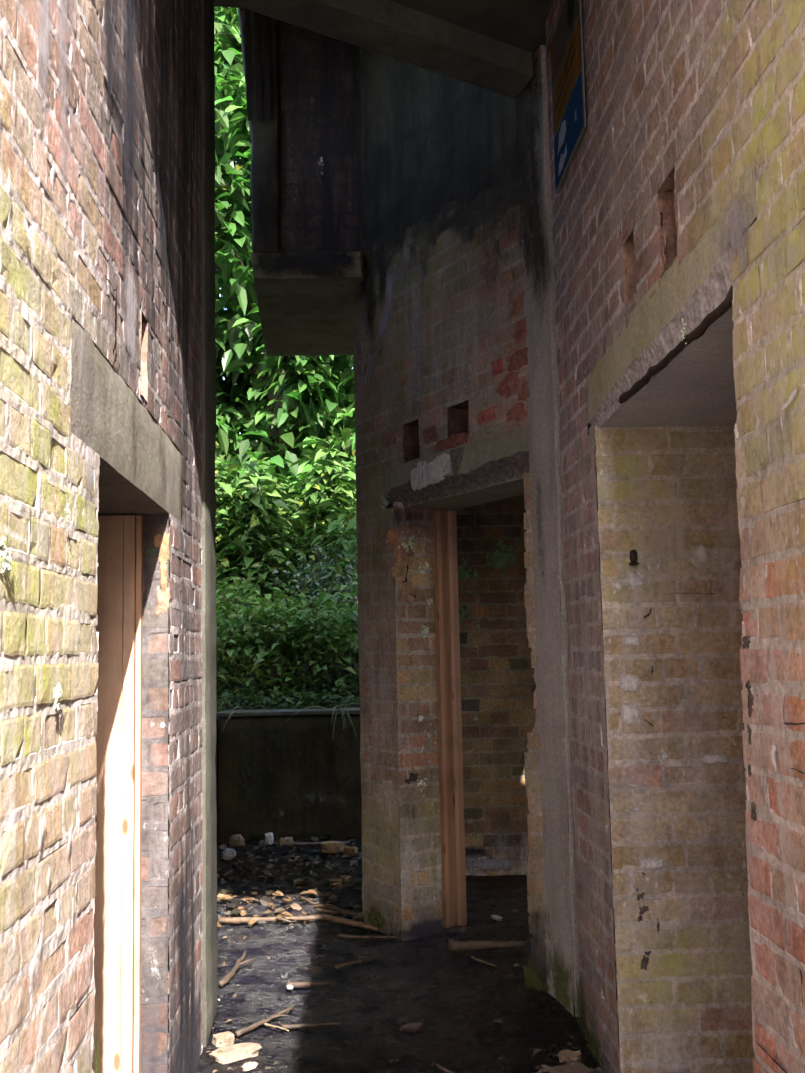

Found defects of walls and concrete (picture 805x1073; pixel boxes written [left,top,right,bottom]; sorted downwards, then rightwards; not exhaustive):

damp [516,46,546,300]
damp [356,247,420,384]
spalling [477,290,530,424]
spalling [384,425,531,508]
crack [754,1040,787,1073]